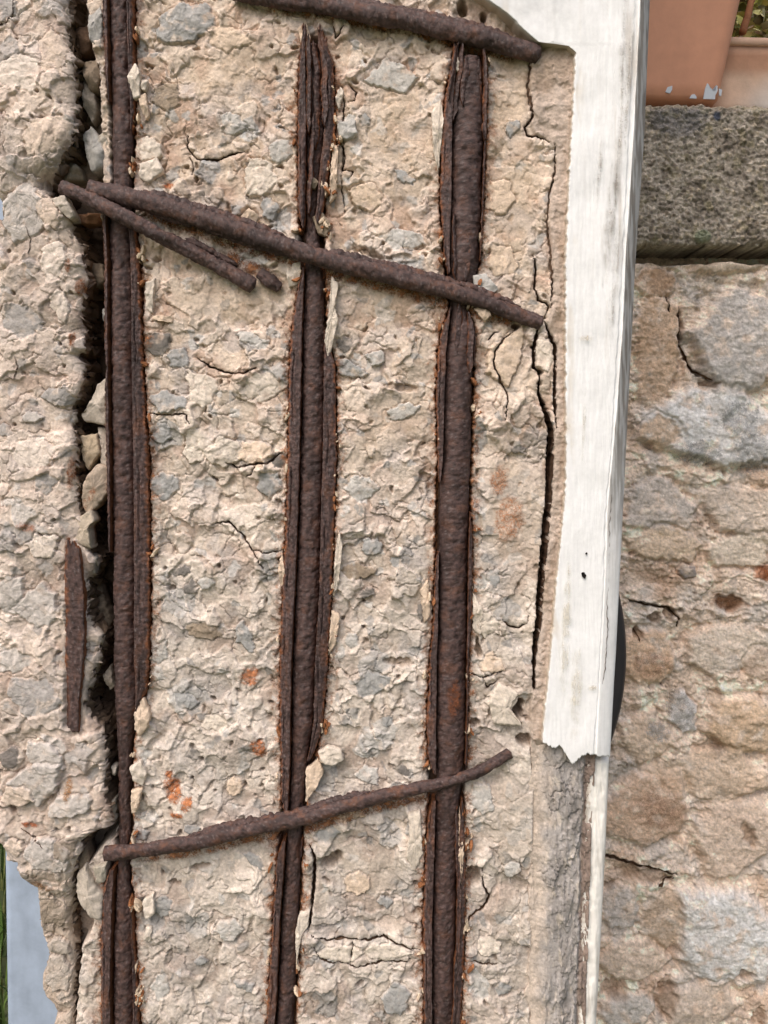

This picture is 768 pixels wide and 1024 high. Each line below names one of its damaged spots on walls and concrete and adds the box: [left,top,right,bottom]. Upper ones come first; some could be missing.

corrosion [268,7,512,112]
crack [488,63,557,689]
crack [665,297,712,381]
spalling [64,538,87,732]
corrosion [163,771,192,818]
corrosion [250,587,283,810]
corrosion [311,350,343,763]
spalling [76,0,596,1024]
crack [308,845,415,968]
corrosion [322,268,450,770]
corrosion [449,306,512,770]
crack [605,854,677,887]